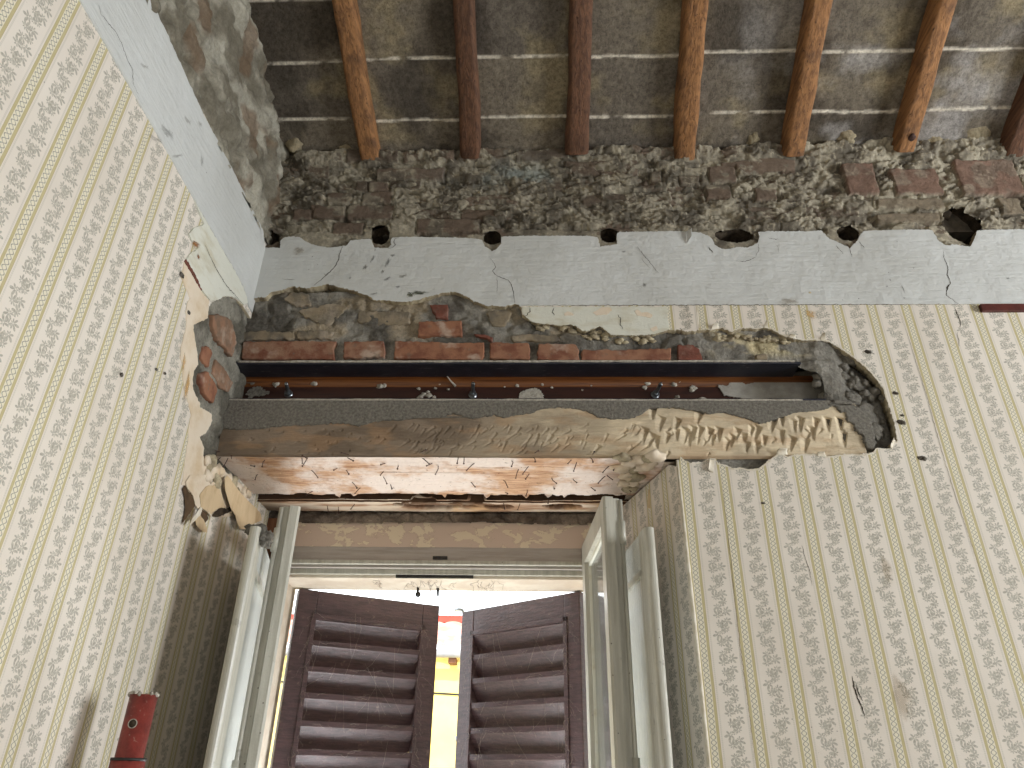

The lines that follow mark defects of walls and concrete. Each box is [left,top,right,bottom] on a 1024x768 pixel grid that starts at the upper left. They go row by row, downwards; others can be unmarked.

flaking render [146,0,1024,251]
spalling [180,200,906,504]
crack [540,251,990,598]
crack [852,677,865,716]